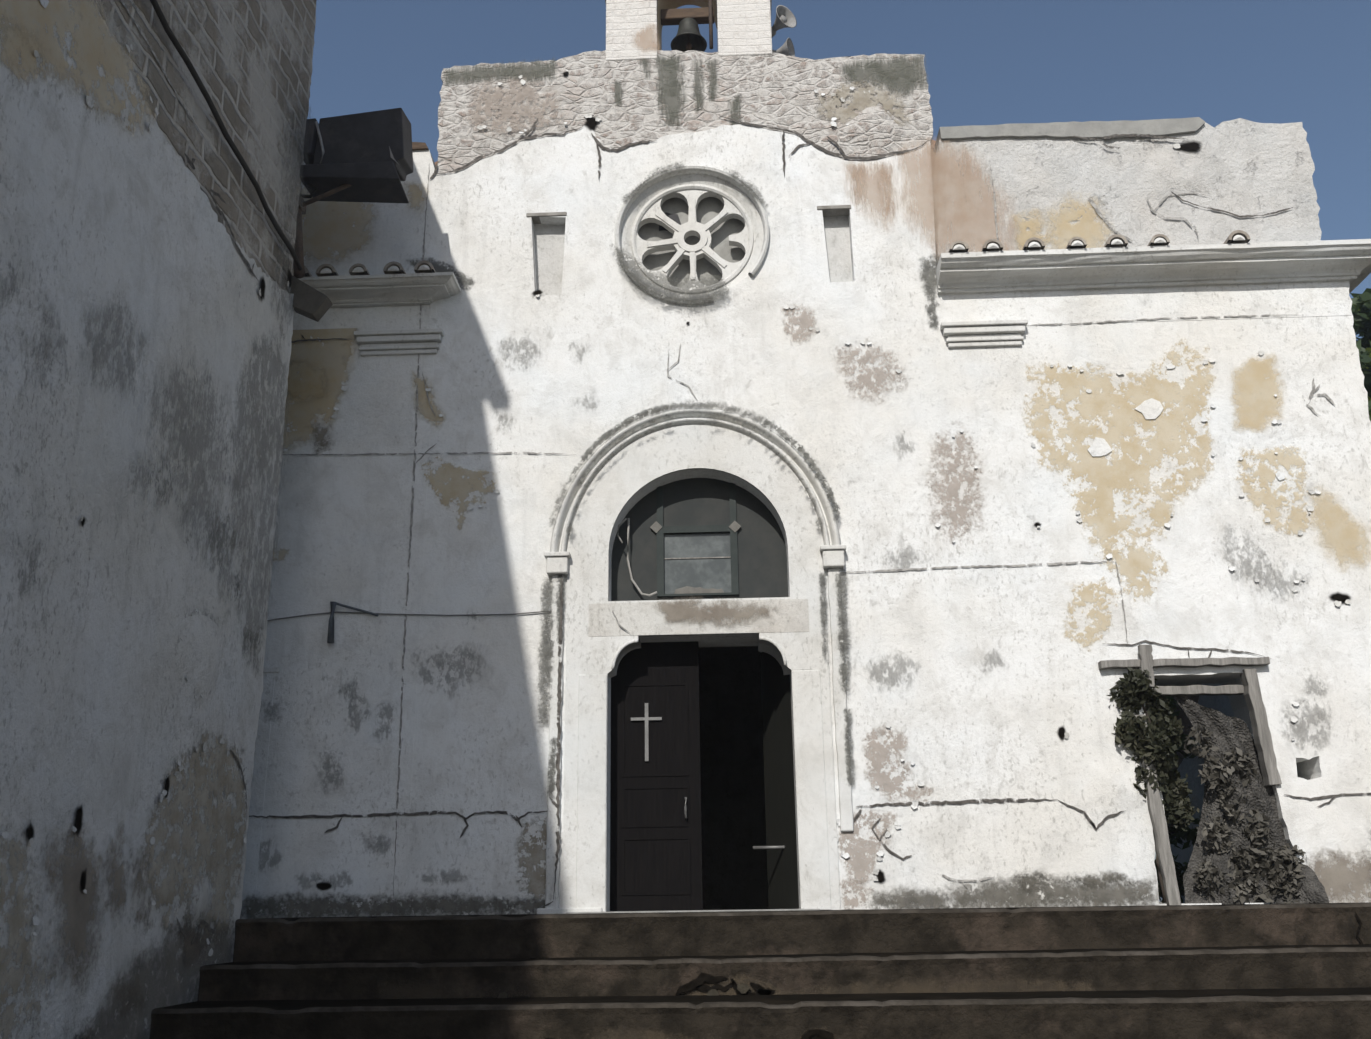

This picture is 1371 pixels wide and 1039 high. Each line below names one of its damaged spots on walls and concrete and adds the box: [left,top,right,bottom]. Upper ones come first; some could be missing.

crack [719,115,930,177]
crack [1147,191,1293,241]
peeling [283,328,355,451]
peeling [1234,351,1282,429]
peeling [1025,342,1216,651]
peeling [1237,447,1368,563]
crack [231,305,575,911]
spalling [1330,592,1351,607]
crack [853,798,1124,860]
crack [1287,793,1371,807]
damp [45,827,150,984]
damp [74,894,545,1039]